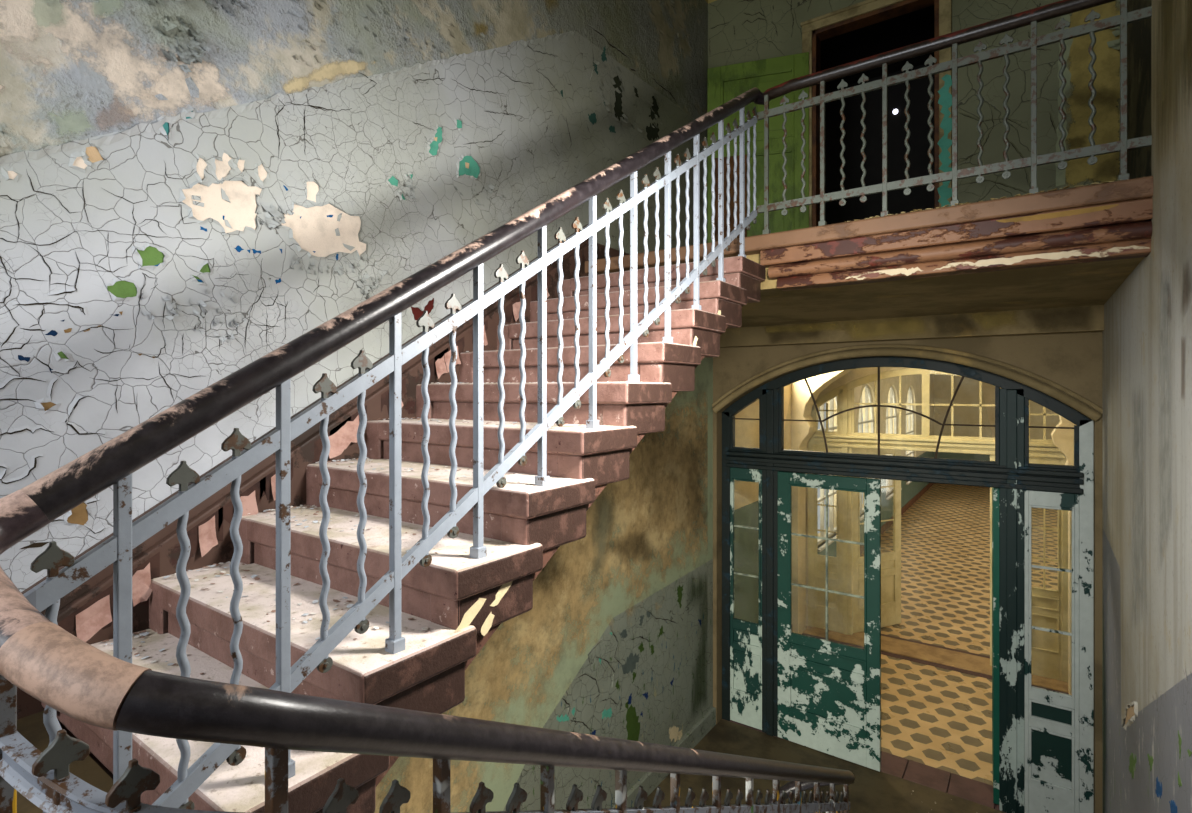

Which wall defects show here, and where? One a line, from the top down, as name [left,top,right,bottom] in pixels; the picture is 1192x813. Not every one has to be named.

peeling [123,0,228,140]
crack [275,72,377,156]
crack [958,104,1057,193]
peeling [45,320,101,373]
crack [0,166,288,484]
peeling [102,242,247,343]
peeling [178,149,390,298]
peeling [846,245,1150,280]
crack [51,497,105,534]
leakage [444,402,708,721]
leakage [374,757,433,813]
leakage [450,760,478,812]